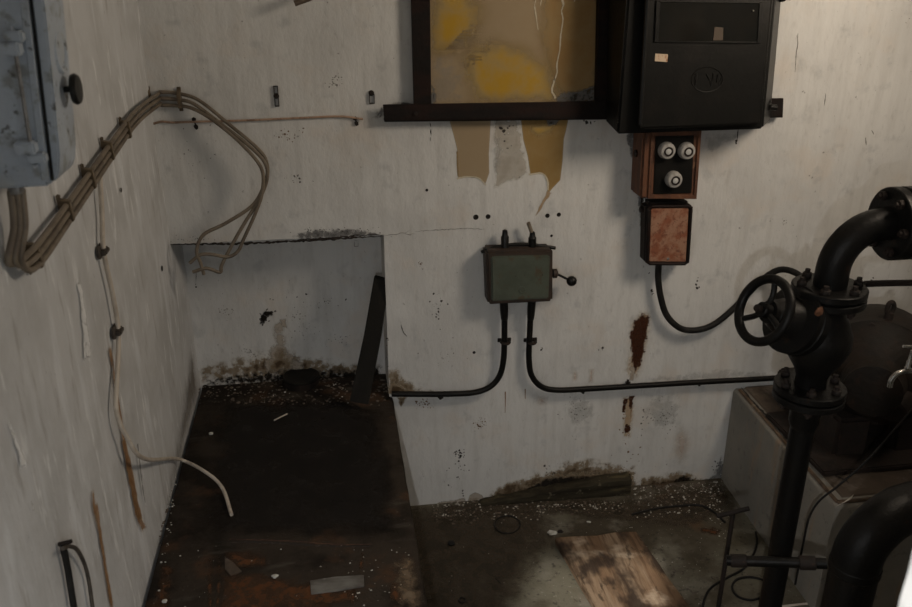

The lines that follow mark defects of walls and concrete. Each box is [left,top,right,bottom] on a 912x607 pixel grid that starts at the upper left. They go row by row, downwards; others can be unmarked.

peeling [450,120,568,218]
crack [170,227,479,246]
leakage [182,293,357,440]
corrosion [629,313,650,380]
corrosion [122,434,145,530]
leakage [441,449,723,503]
corrosion [618,396,641,468]
corrosion [92,492,113,607]